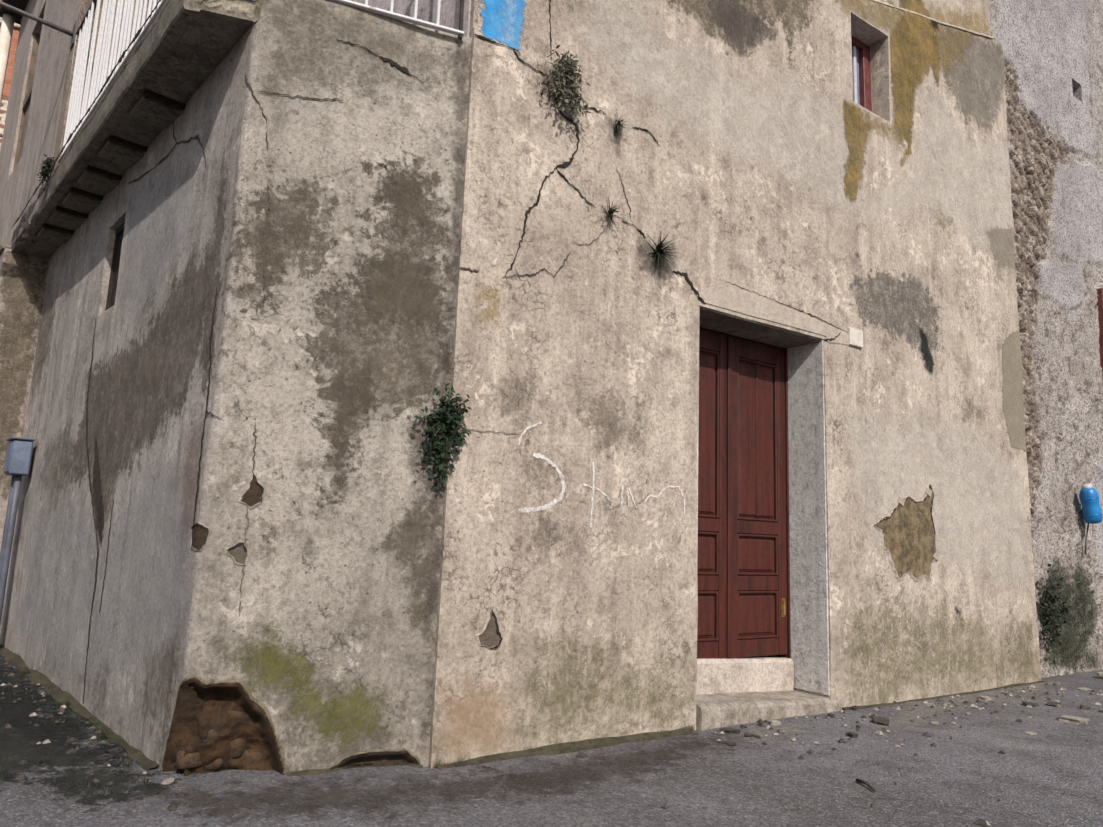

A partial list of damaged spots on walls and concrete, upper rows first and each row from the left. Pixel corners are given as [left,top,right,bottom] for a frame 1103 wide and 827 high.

crack [0,0,161,247]
crack [454,0,646,278]
damp [669,0,814,64]
damp [836,0,1004,201]
damp [67,153,232,545]
damp [293,133,466,508]
crack [672,270,706,304]
crack [83,319,114,703]
flaking render [237,474,265,510]
flaking render [475,609,503,649]
flaking render [873,482,940,582]
spalling [160,674,289,786]